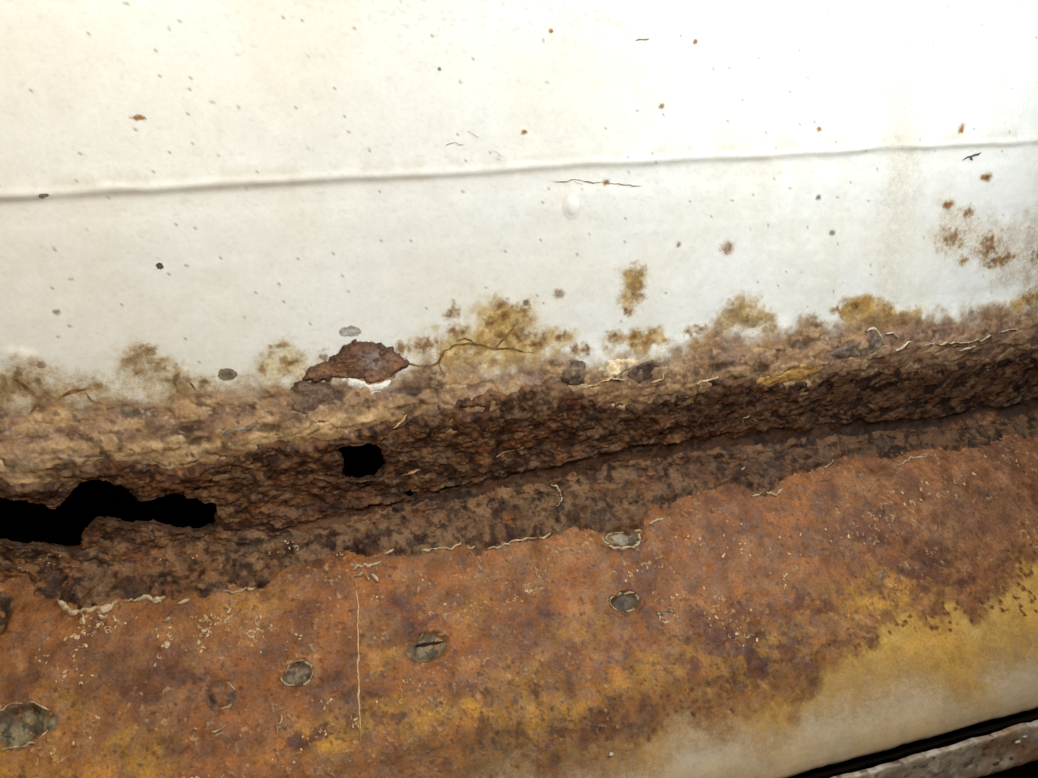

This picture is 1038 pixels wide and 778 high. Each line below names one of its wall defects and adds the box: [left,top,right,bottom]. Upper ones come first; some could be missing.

corrosion [943,227,1038,275]
corrosion [619,266,646,315]
peeling [339,325,361,336]
crack [402,323,535,374]
corrosion [0,288,1038,486]
spalling [0,327,1038,686]
corrosion [0,434,1038,778]